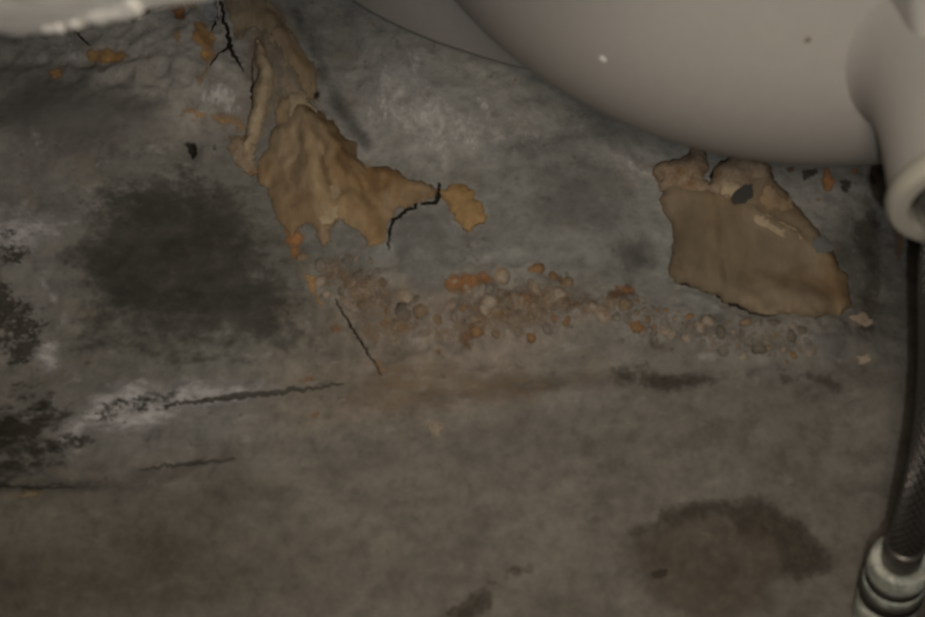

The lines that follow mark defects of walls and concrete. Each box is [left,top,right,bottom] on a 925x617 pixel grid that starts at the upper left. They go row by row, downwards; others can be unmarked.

crack [210,0,254,109]
peeling [227,38,487,247]
leakage [0,220,58,264]
leakage [79,189,285,336]
crack [386,182,442,251]
peeling [582,148,873,365]
leakage [0,282,58,372]
crack [335,298,382,375]
leakage [0,381,344,487]
leakage [640,499,829,614]